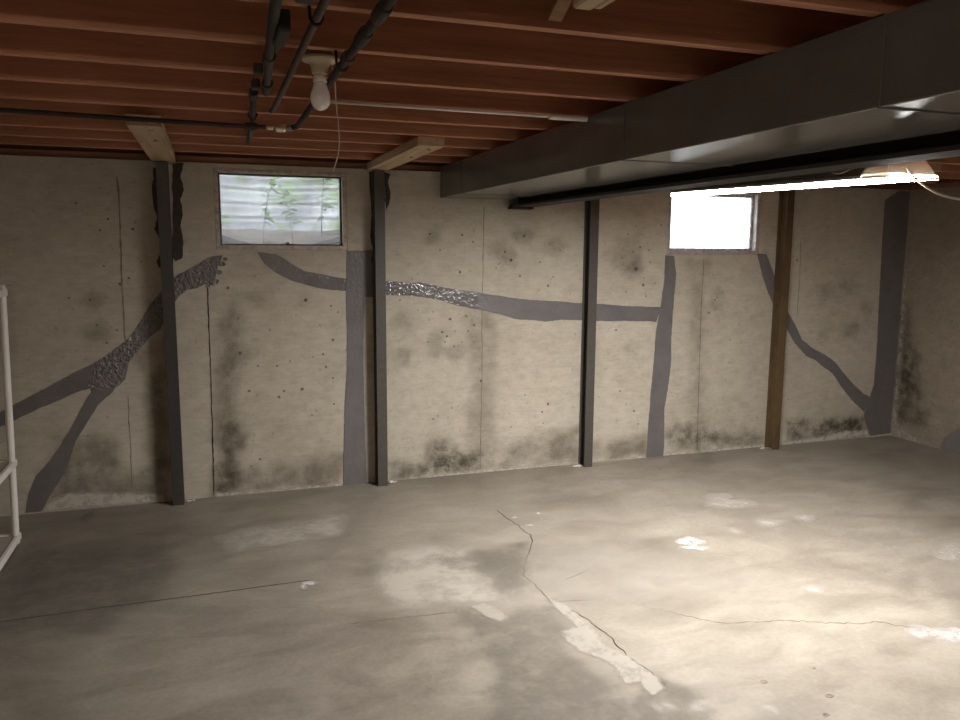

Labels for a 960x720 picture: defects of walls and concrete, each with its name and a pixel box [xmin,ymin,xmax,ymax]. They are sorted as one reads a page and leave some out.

crack [0,255,228,513]
crack [257,250,676,485]
leakage [402,464,568,479]
leakage [782,421,868,445]
crack [757,191,910,436]
crack [497,510,668,692]
crack [641,604,916,628]